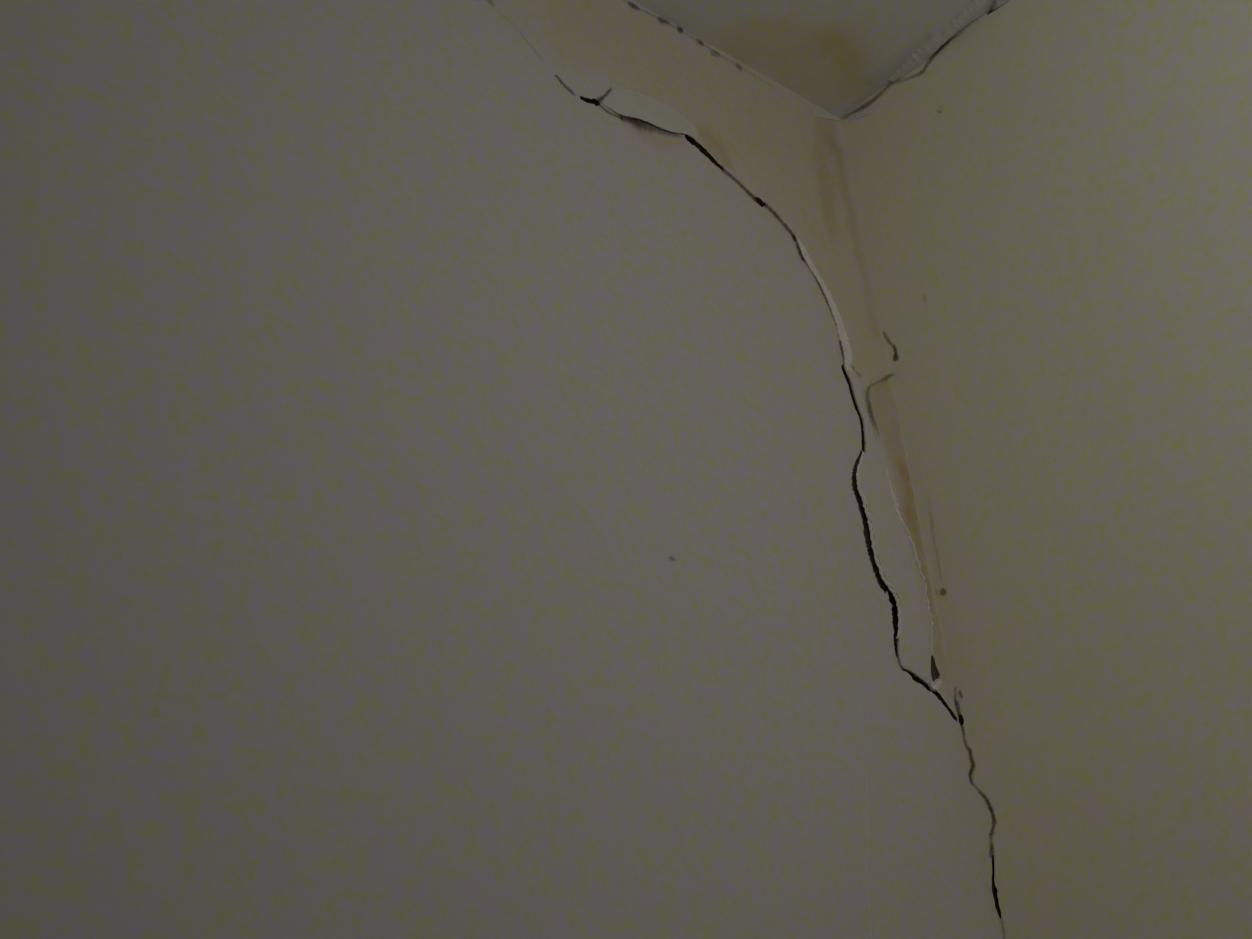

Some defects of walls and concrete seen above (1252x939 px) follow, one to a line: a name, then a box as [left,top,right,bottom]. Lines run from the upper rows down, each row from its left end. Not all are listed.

crack [560,80,647,127]
peeling [602,89,700,140]
crack [685,134,1001,918]
peeling [847,370,942,692]